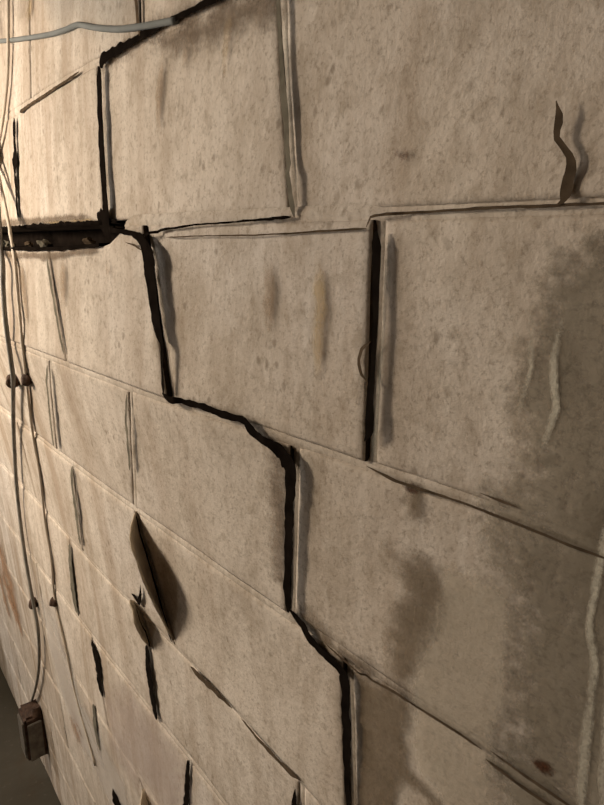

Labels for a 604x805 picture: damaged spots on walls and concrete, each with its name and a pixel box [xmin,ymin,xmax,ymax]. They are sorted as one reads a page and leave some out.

crack [166,101,604,238]
crack [2,0,481,805]
crack [367,466,604,559]
damp [476,230,604,805]
damp [392,558,446,677]
damp [353,676,439,805]
crack [486,751,569,805]